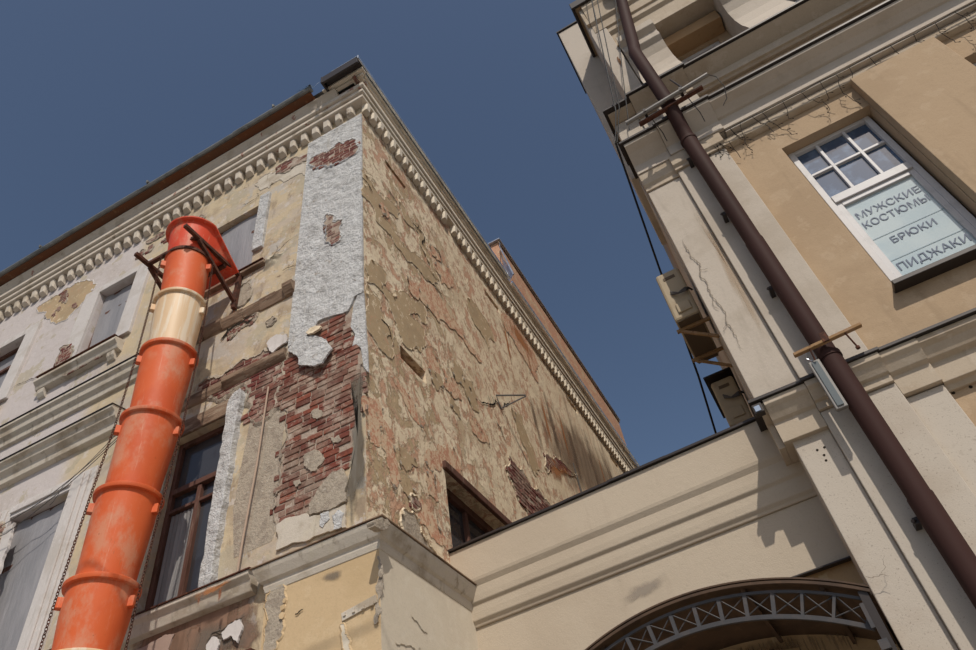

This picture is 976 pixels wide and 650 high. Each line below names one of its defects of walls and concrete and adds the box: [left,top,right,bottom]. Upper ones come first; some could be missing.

flaking render [255,138,361,191]
flaking render [323,213,343,246]
peeling [36,279,97,325]
peeling [360,170,490,446]
peeling [466,297,495,348]
flaking render [195,279,384,551]
flaking render [505,407,577,515]
peeling [399,443,462,554]
peeling [0,520,16,575]
peeling [136,634,175,650]
peeling [206,619,244,650]